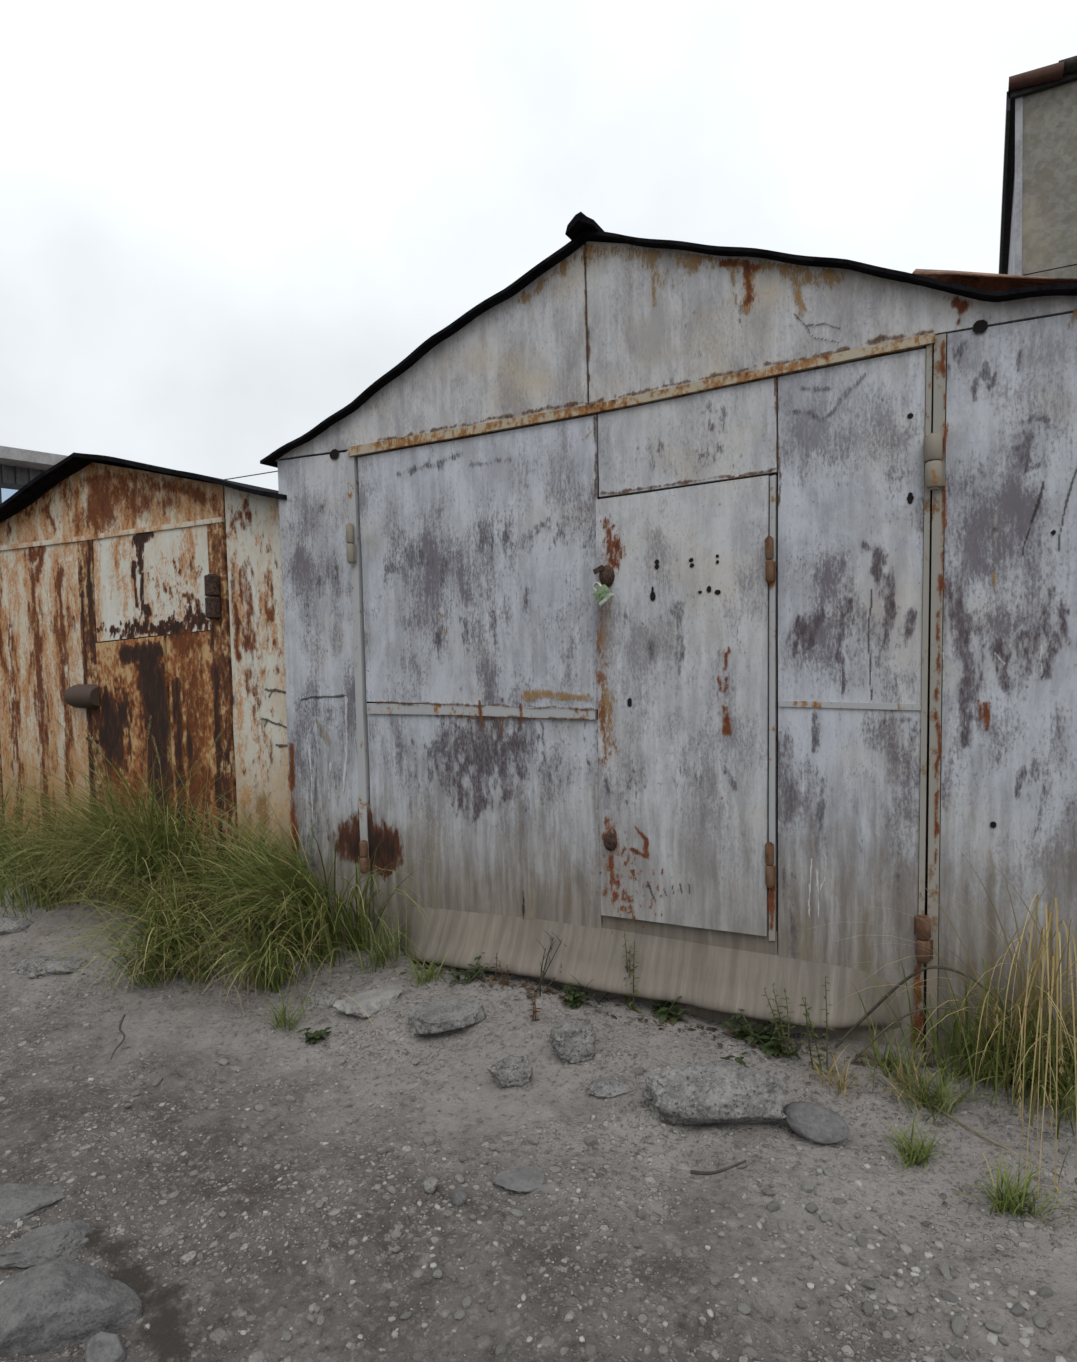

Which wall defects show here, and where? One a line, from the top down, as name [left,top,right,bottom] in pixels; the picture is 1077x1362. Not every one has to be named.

corrosion [378,290,850,506]
corrosion [0,468,281,875]
corrosion [600,517,626,571]
corrosion [717,647,731,737]
peeling [787,597,855,694]
peeling [862,541,917,665]
corrosion [934,486,947,870]
peeling [944,587,1070,747]
corrosion [288,743,299,867]
corrosion [327,809,403,881]
peeling [409,699,563,822]
corrosion [587,817,663,928]